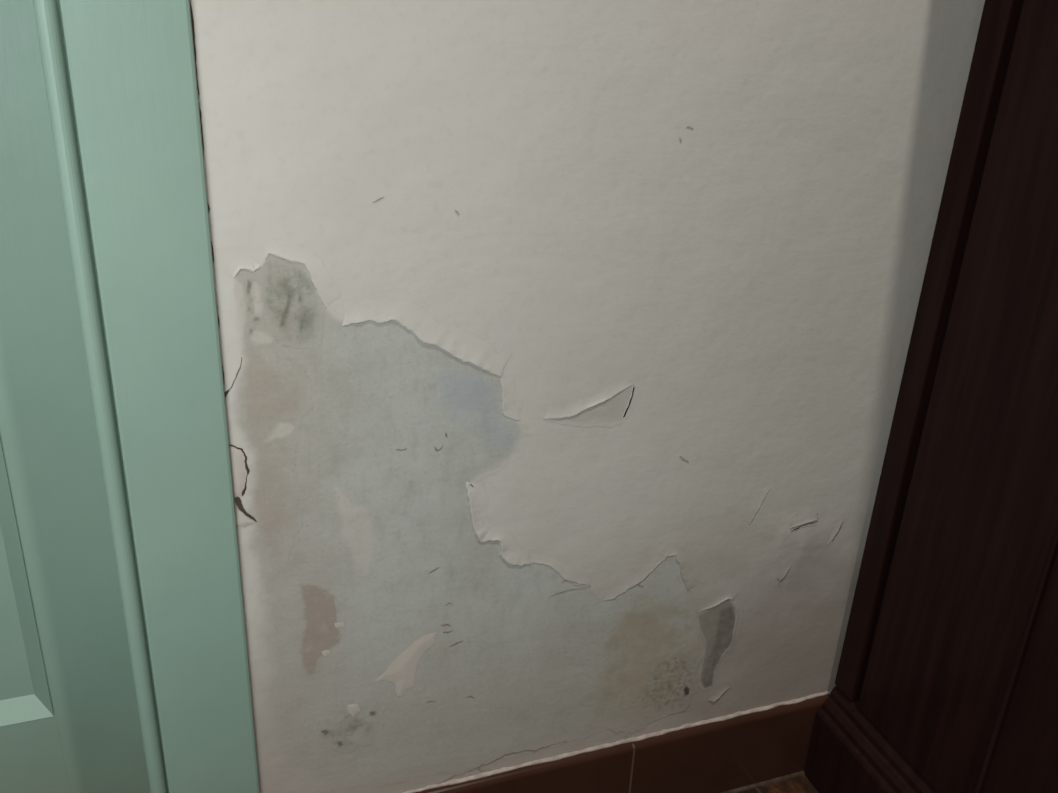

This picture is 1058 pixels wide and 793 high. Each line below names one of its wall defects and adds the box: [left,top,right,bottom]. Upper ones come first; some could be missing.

damp [231,258,325,579]
damp [316,701,388,754]
peeling [225,239,744,793]
damp [575,593,706,737]